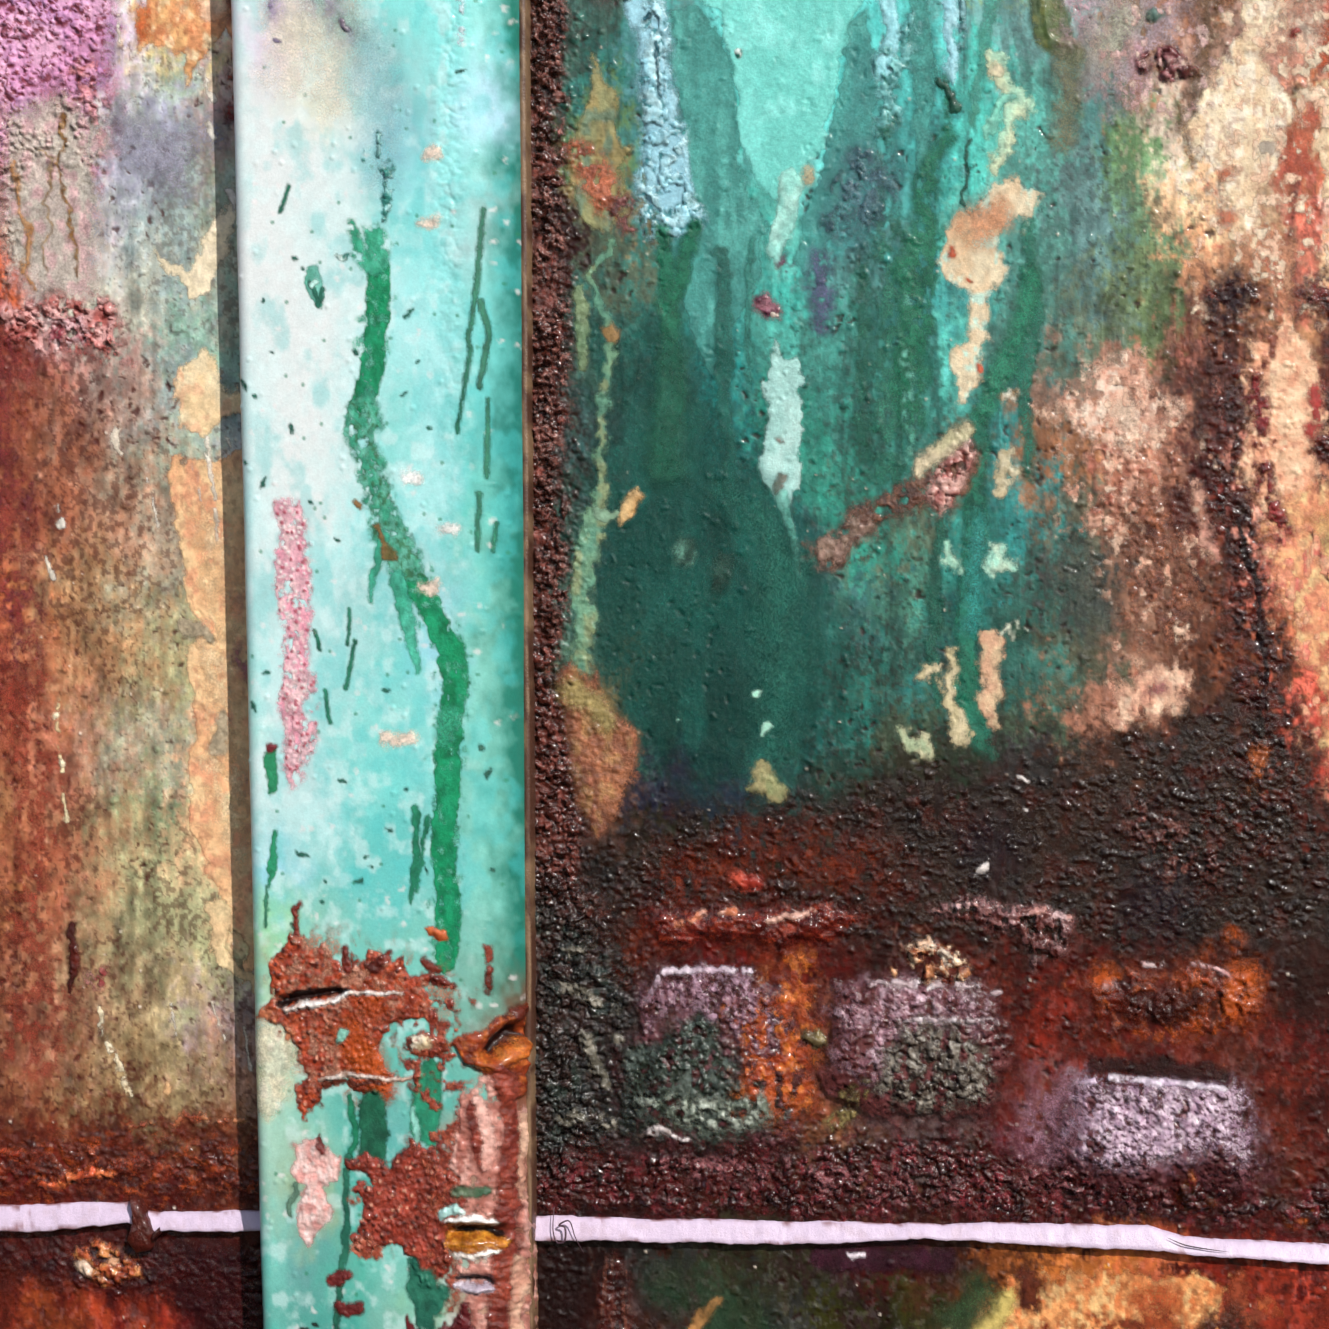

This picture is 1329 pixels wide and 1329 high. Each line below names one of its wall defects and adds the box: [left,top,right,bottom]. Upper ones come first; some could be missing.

peeling [938,49,1039,404]
corrosion [0,293,134,1081]
corrosion [530,0,1329,1215]
corrosion [0,1109,260,1287]
peeling [286,1134,341,1247]
peeling [438,1065,538,1329]
corrosion [544,1242,638,1329]
corrosion [1197,1303,1245,1329]